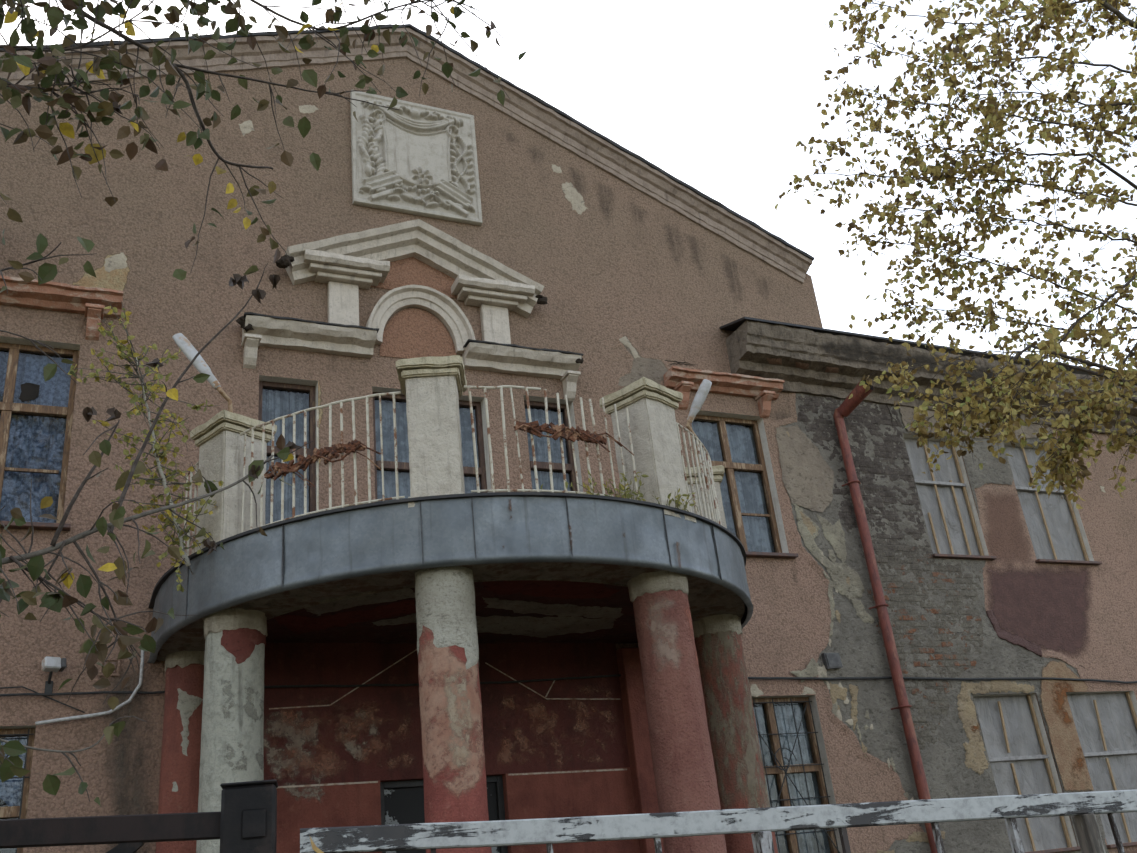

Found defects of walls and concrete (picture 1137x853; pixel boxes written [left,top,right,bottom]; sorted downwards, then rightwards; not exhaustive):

peeling [552,164,588,214]
peeling [73,252,130,291]
peeling [780,393,1093,800]
damp [988,497,1089,654]
peeling [177,688,203,756]
peeling [221,566,623,800]
peeling [750,684,764,697]
peeling [887,819,1012,853]